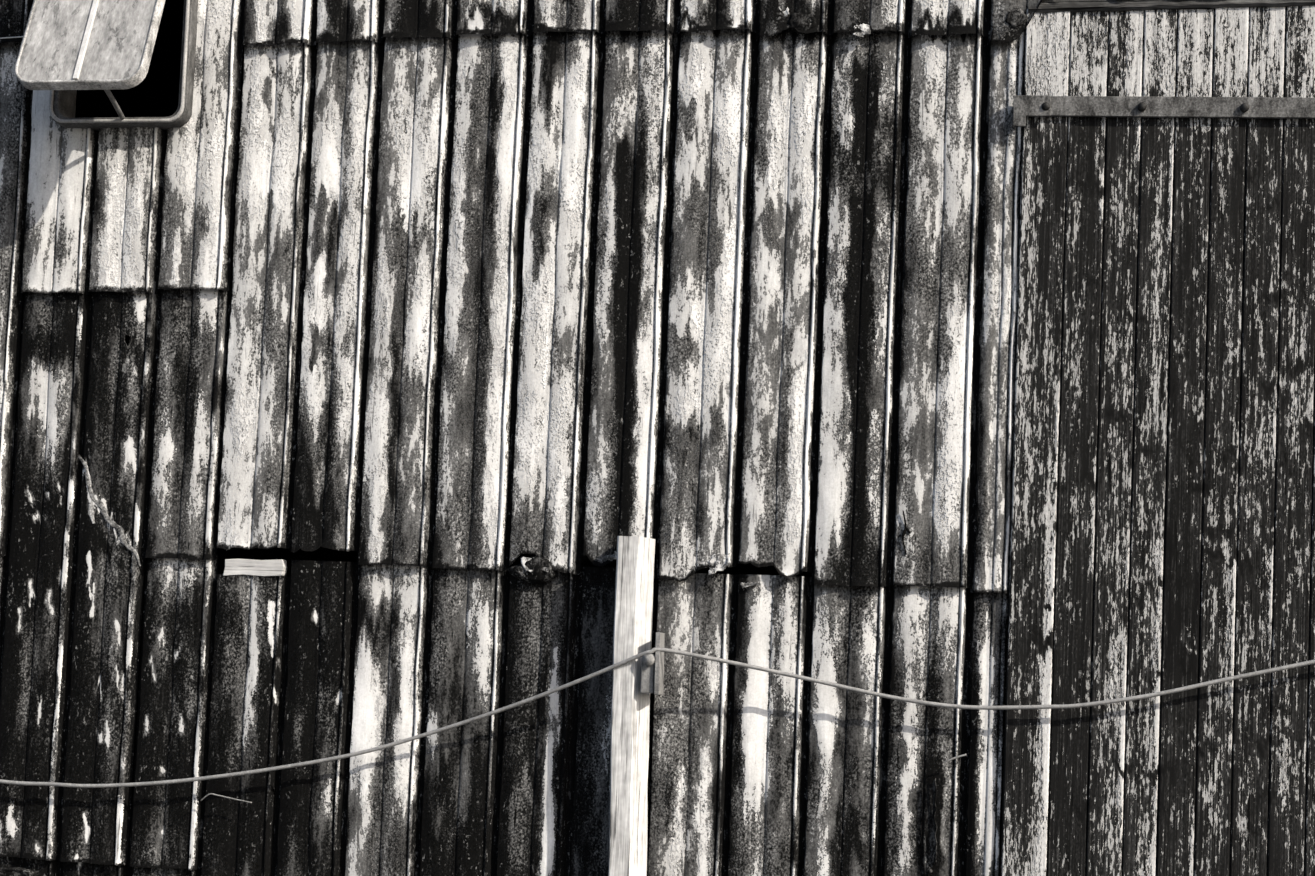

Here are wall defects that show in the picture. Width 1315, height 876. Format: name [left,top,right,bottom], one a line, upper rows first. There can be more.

peeling [1007,9,1108,96]
peeling [1123,5,1315,98]
peeling [1168,118,1177,242]
water stain [0,0,1043,876]
peeling [1052,385,1060,482]
peeling [1266,375,1307,459]
peeling [1029,531,1055,876]
peeling [1106,635,1127,866]
peeling [1144,539,1163,876]
peeling [1224,559,1236,754]
peeling [1265,549,1273,661]
peeling [1278,739,1291,812]